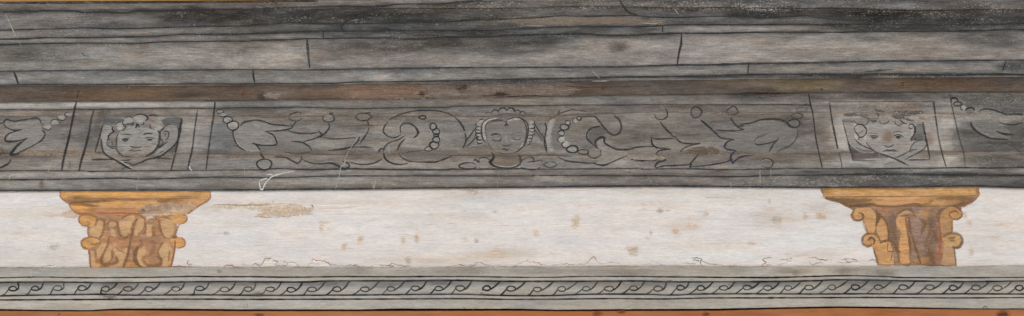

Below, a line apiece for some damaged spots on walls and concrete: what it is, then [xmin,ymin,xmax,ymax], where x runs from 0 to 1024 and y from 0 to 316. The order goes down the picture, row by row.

peeling [211,201,314,218]